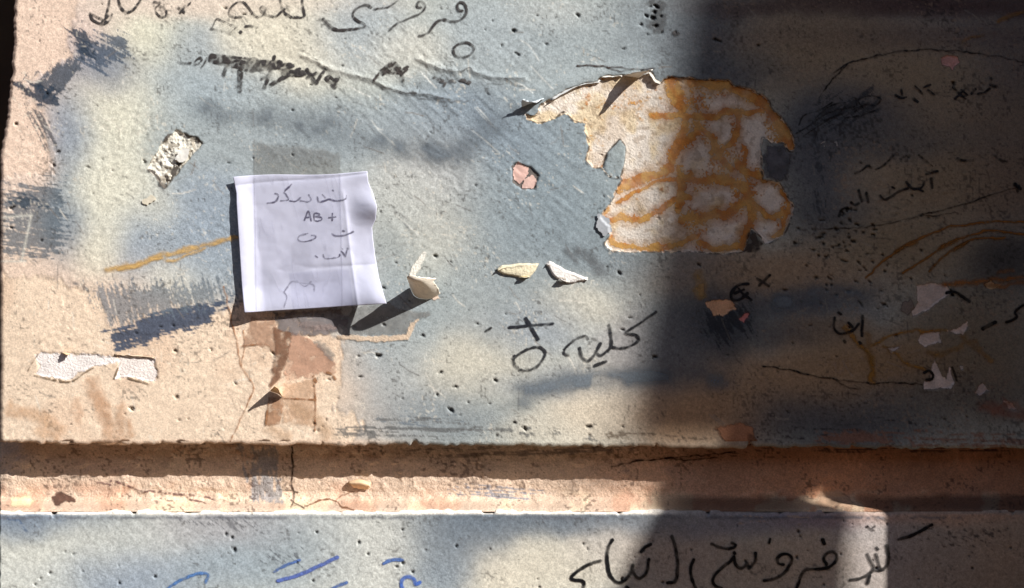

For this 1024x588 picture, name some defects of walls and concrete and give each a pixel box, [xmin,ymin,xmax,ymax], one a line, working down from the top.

spalling [142,130,203,205]
peeling [512,161,538,189]
peeling [521,69,795,255]
peeling [706,299,749,322]
peeling [901,283,949,316]
crack [223,286,254,405]
peeling [28,352,157,384]
crack [762,366,923,389]
peeling [923,361,963,389]
crack [280,446,354,510]